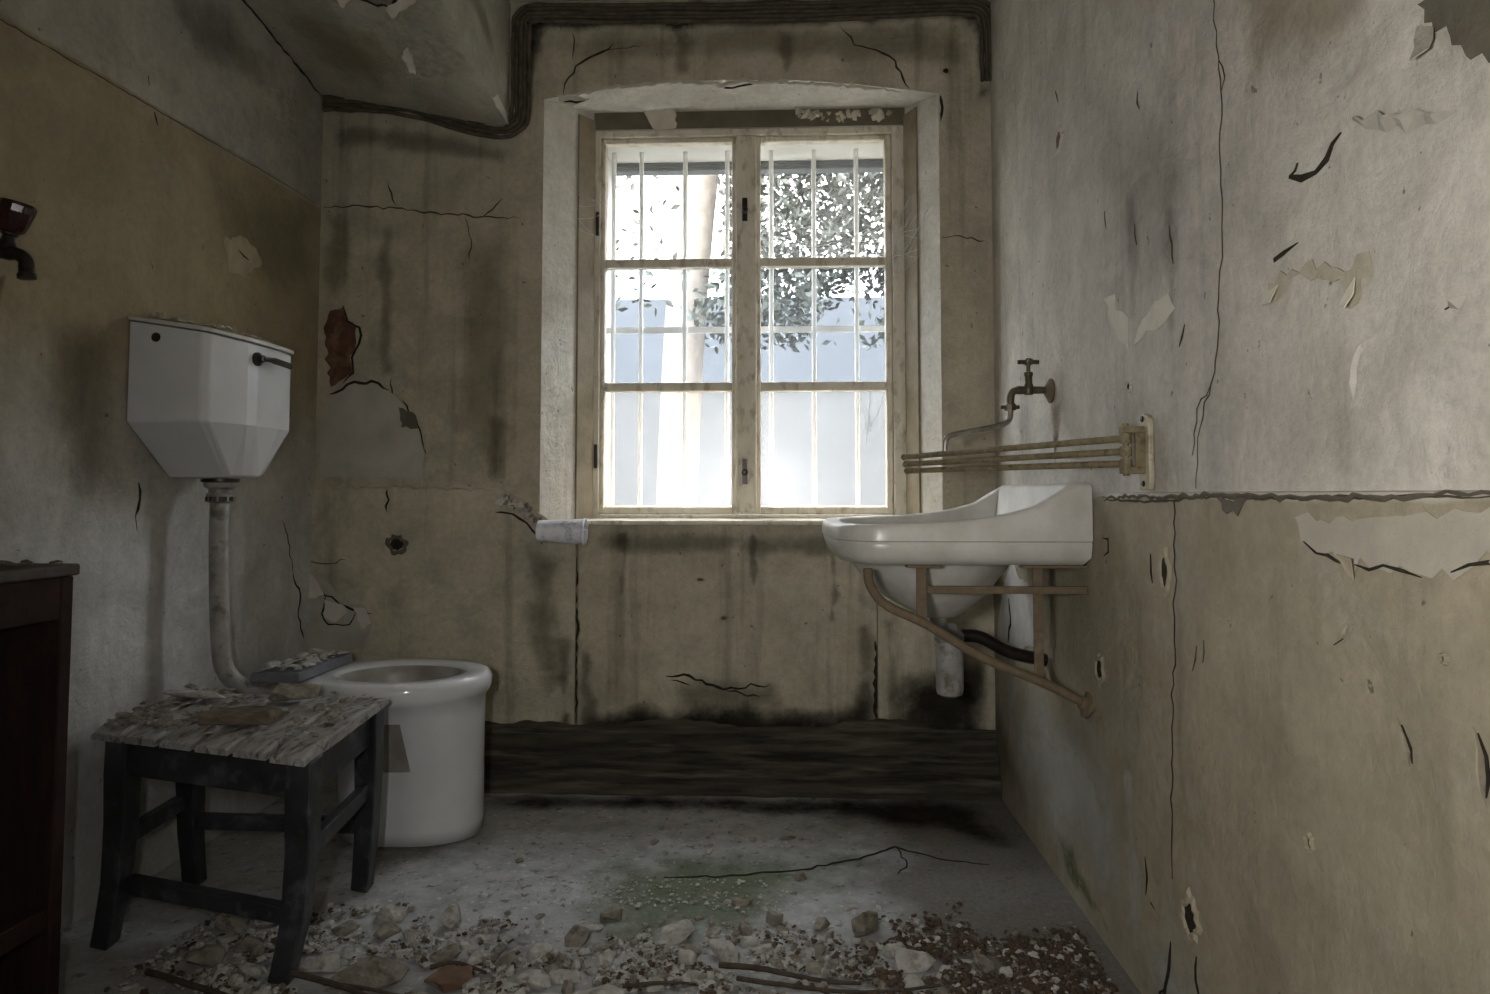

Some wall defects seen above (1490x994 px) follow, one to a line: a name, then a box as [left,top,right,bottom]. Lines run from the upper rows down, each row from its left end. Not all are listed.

peeling [337,0,416,18]
peeling [1409,0,1490,63]
crack [1288,132,1342,183]
peeling [1261,251,1374,309]
crack [1144,0,1225,910]
peeling [1101,489,1490,580]
crack [666,673,771,697]
water stain [602,702,869,727]
water stain [900,669,981,729]
crack [664,846,989,878]
flaking render [1180,886,1203,944]
crack [1159,941,1199,994]